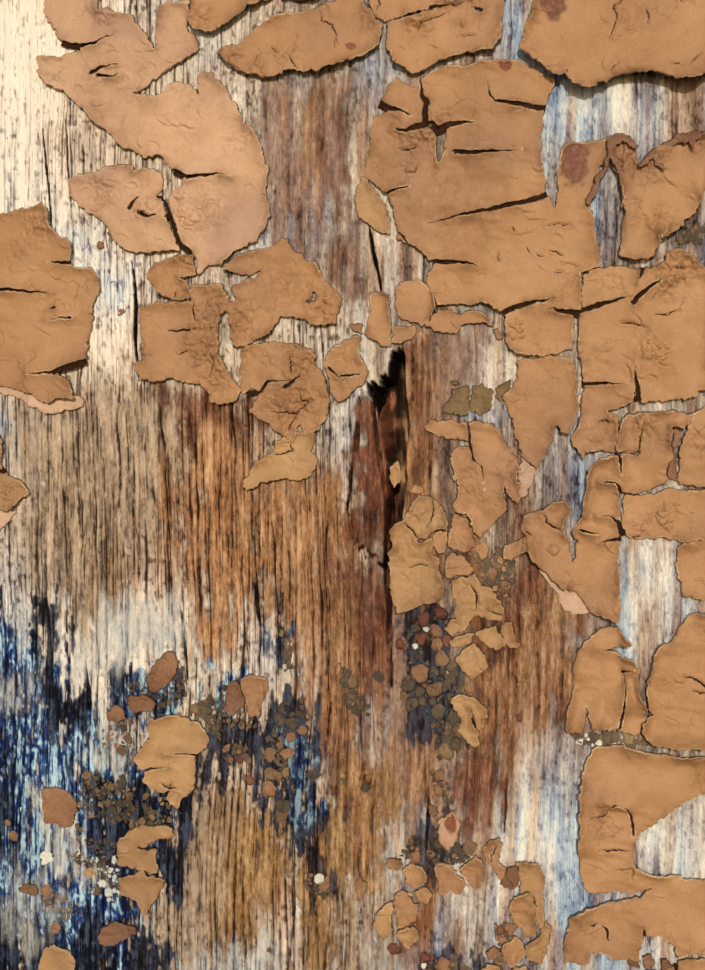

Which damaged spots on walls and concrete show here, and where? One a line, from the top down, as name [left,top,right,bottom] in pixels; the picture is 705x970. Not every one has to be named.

crack [61,35,108,49]
crack [91,66,116,77]
peeling [216,0,505,78]
crack [377,80,511,194]
crack [489,93,546,113]
peeling [36,0,417,490]
peeling [0,202,114,414]
crack [501,267,679,339]
peeling [354,0,705,970]
peeling [39,651,309,946]
crack [596,805,634,876]
peeling [18,883,81,970]